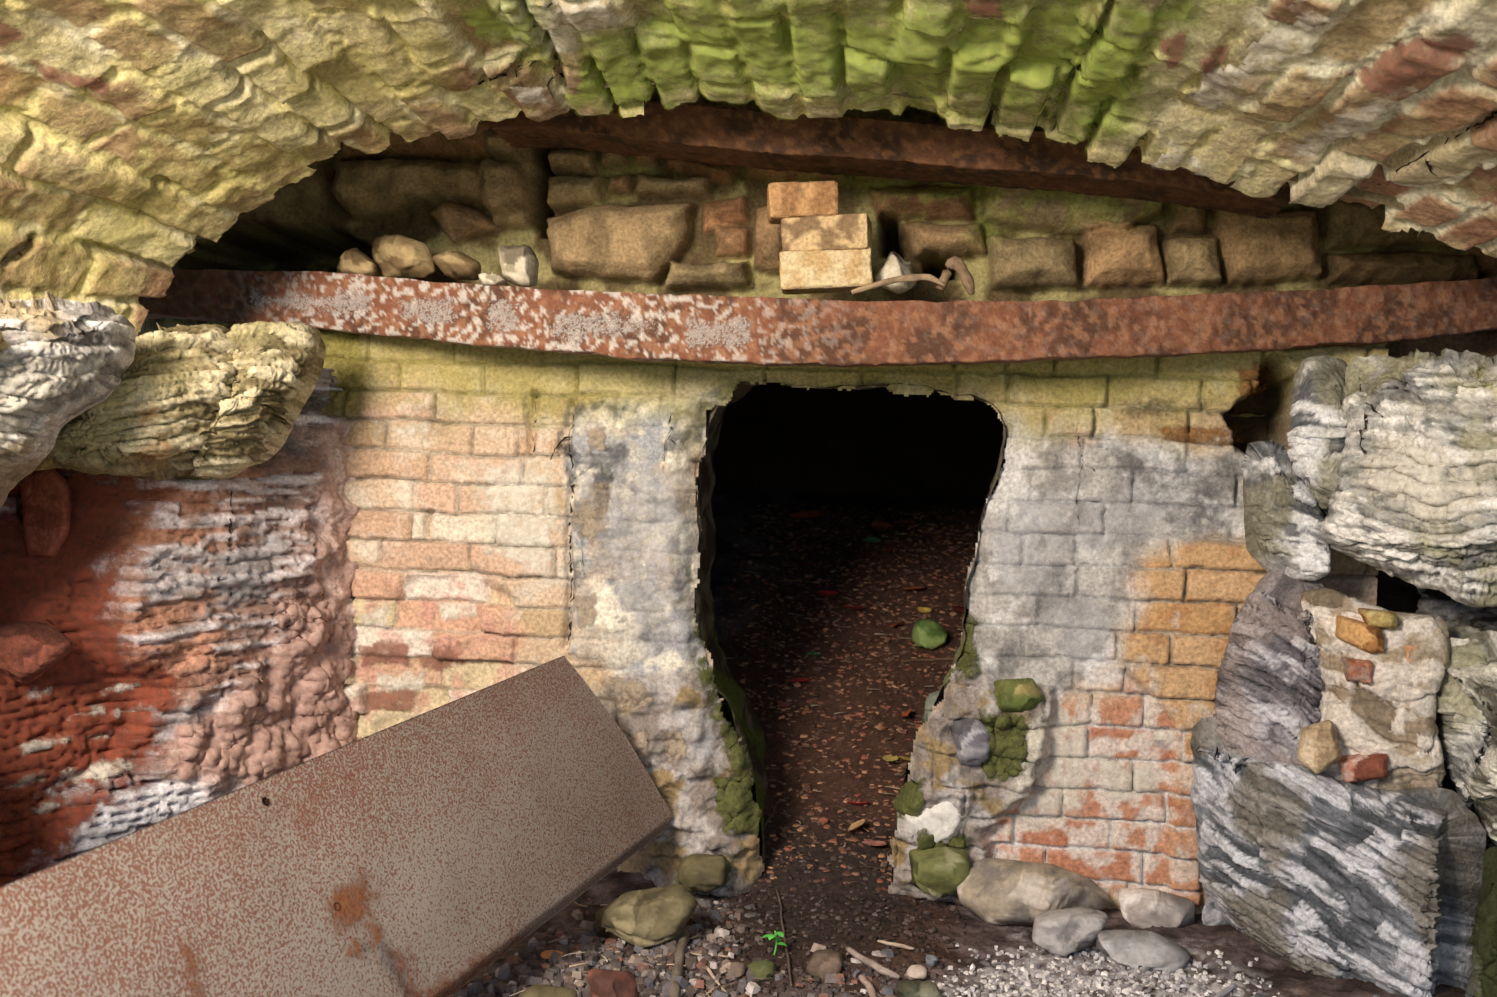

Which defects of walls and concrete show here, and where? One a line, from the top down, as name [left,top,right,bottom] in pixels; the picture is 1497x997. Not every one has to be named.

water stain [459,0,651,106]
water stain [1065,36,1142,139]